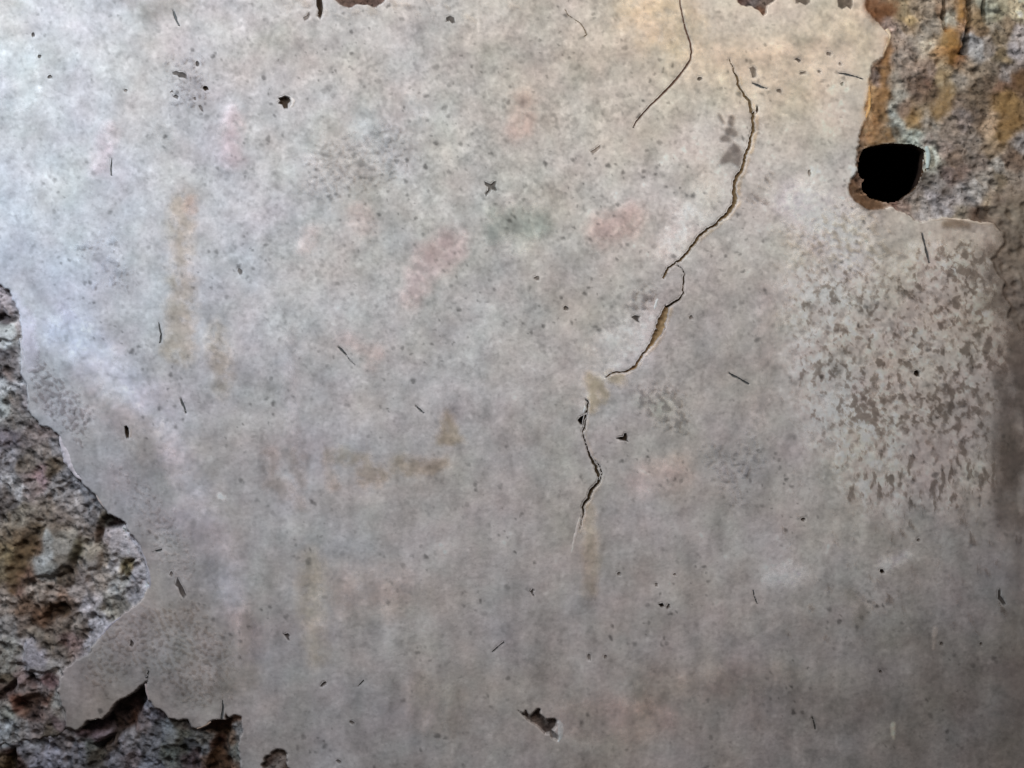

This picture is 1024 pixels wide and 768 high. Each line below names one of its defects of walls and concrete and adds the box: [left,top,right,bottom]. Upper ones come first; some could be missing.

crack [632,0,693,128]
crack [605,58,759,378]
spalling [780,0,1024,544]
spalling [0,284,243,768]
crack [571,398,603,553]
spalling [518,708,563,742]